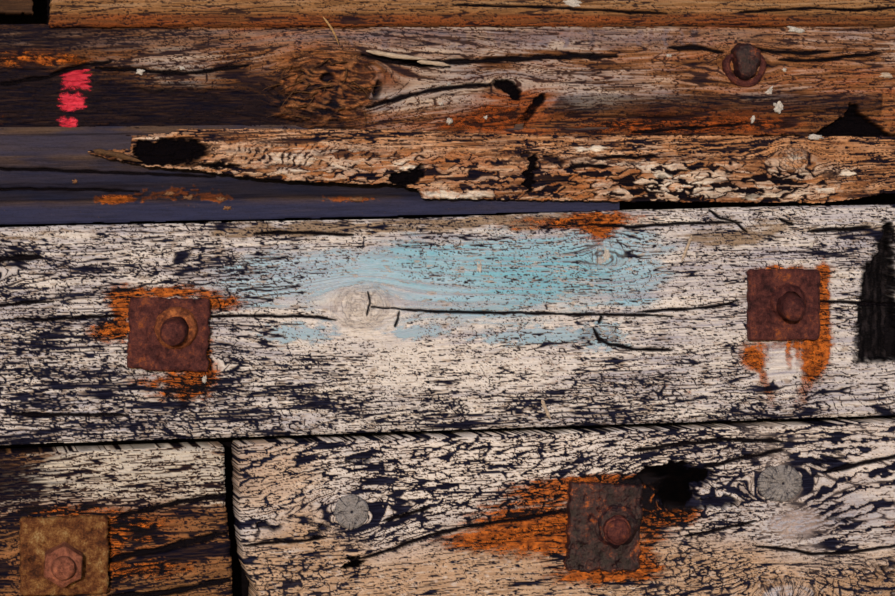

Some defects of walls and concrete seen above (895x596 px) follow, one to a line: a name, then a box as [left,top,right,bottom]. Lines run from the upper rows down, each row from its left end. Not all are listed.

crack [361,53,618,109]
rust [531,211,645,241]
rust [91,283,238,343]
crack [210,313,336,321]
crack [366,291,739,351]
rust [741,263,834,384]
crack [820,299,895,307]
rust [137,334,220,401]
rust [19,504,192,580]
crack [383,506,430,521]
crack [352,510,567,561]
rust [441,472,703,587]